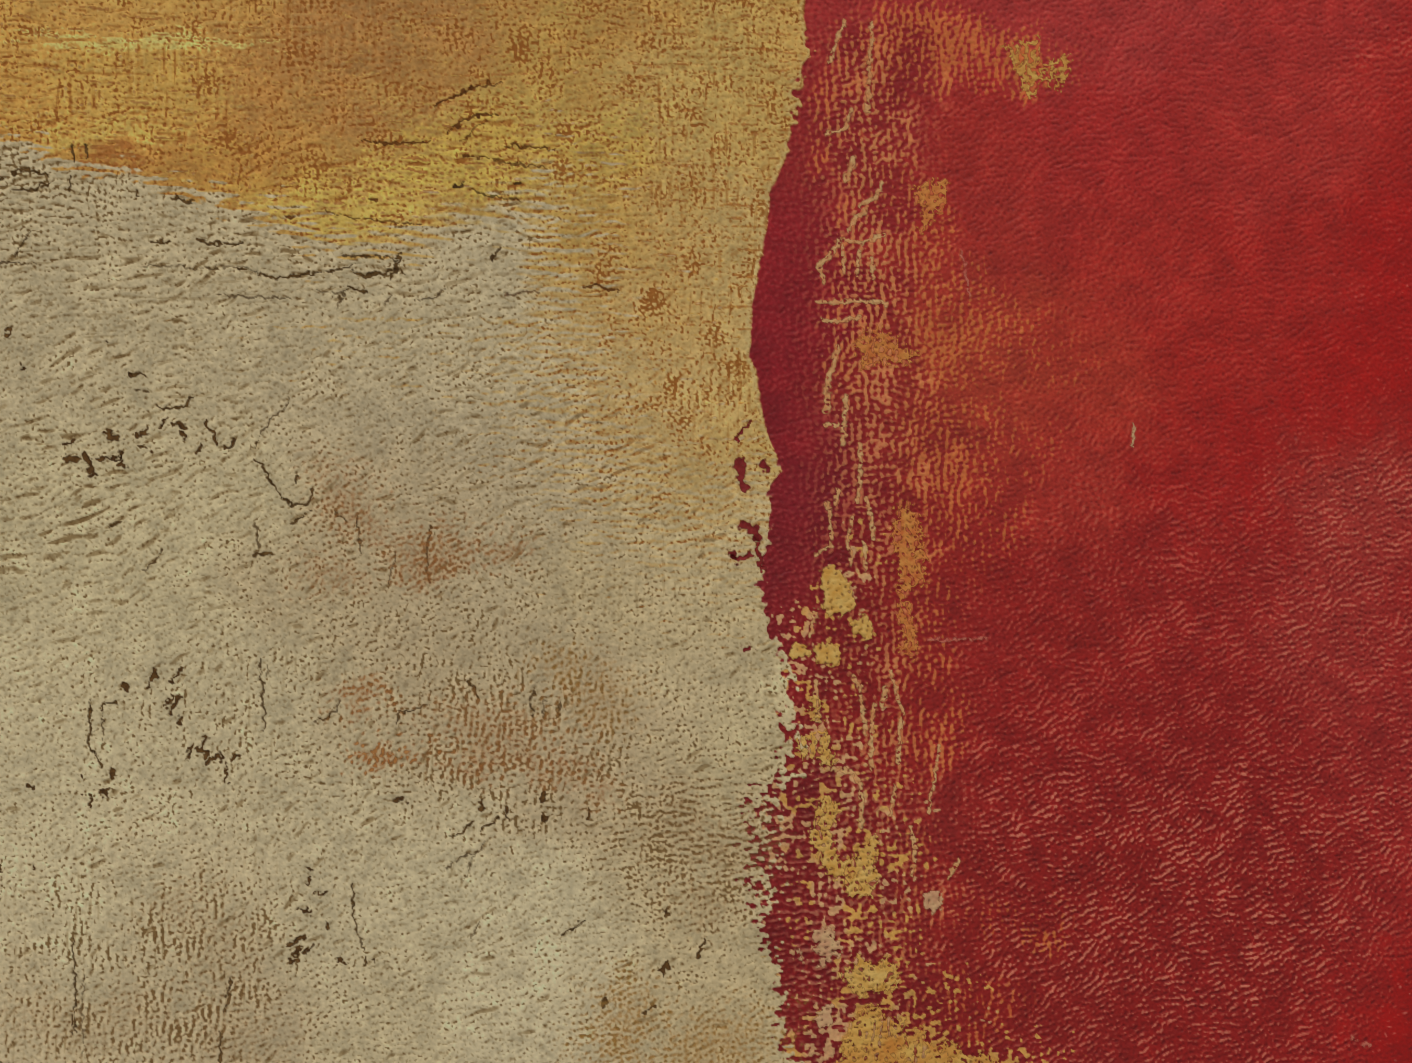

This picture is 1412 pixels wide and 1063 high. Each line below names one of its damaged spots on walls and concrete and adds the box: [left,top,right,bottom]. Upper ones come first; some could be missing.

peeling [825,19,874,136]
peeling [1002,35,1071,99]
peeling [843,156,855,183]
peeling [911,177,950,234]
peeling [733,420,770,493]
peeling [728,520,767,573]
peeling [789,181,930,899]
peeling [927,744,941,814]
peeling [923,858,960,915]
peeling [796,926,999,1063]